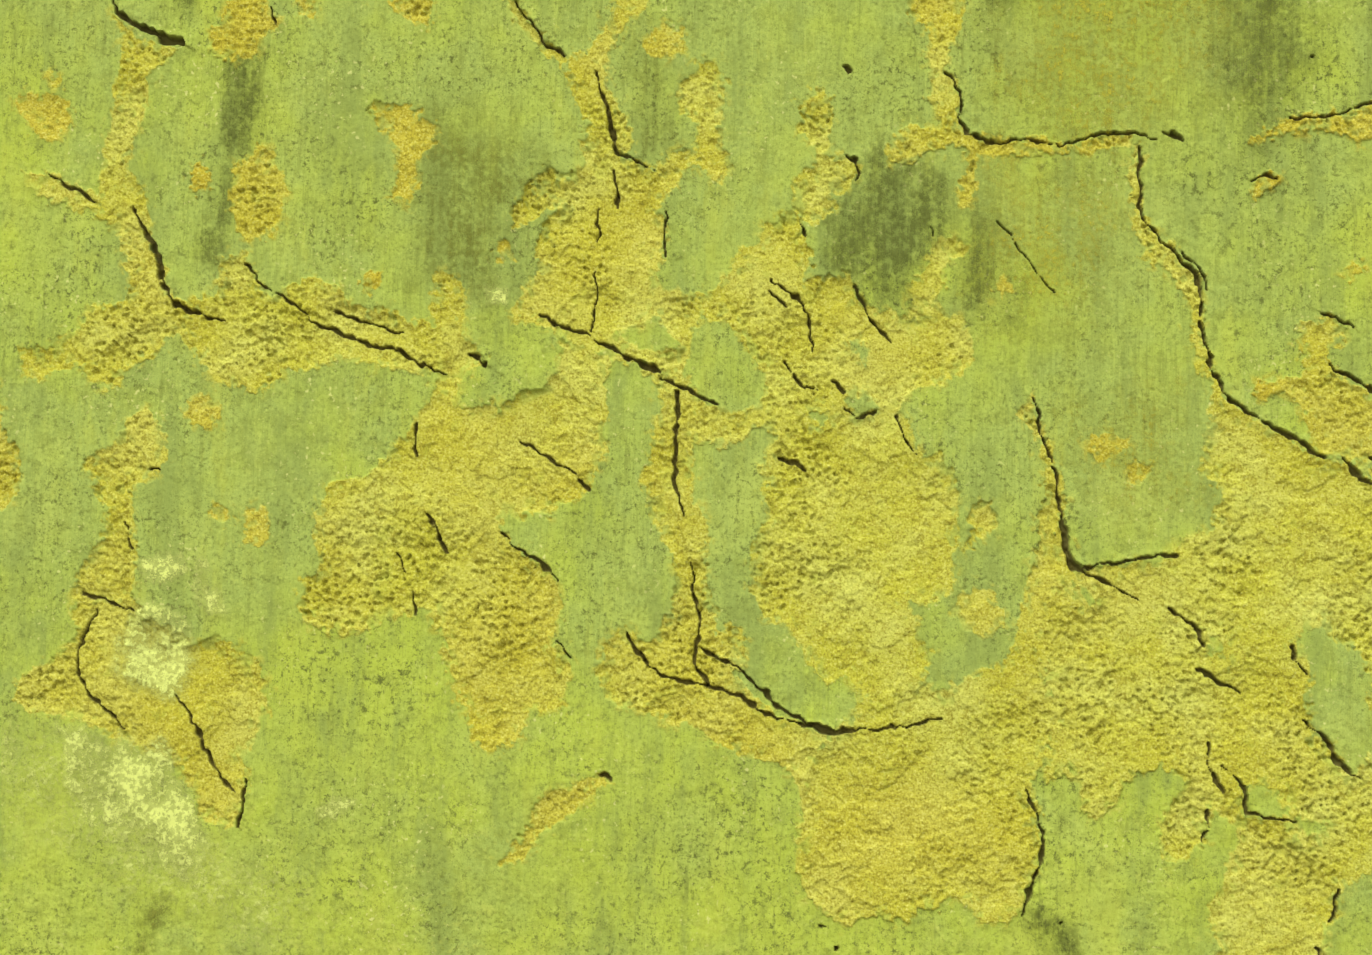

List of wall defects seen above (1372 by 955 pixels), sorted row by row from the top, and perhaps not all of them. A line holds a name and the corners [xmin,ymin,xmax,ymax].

crack [112,0,186,47]
spalling [0,400,25,512]
crack [132,207,226,322]
crack [244,264,489,376]
spalling [12,0,827,831]
crack [538,73,718,518]
crack [769,278,918,455]
spalling [683,0,1372,955]
crack [1032,398,1241,695]
crack [944,72,1372,485]
crack [626,563,943,737]
spalling [497,771,614,868]